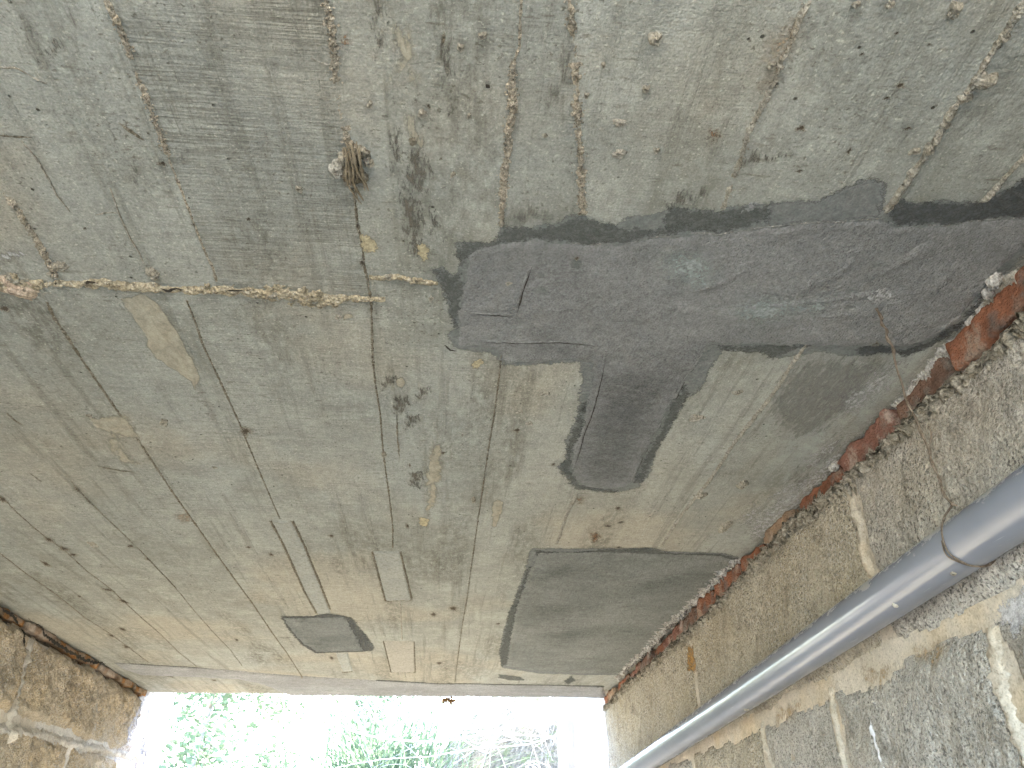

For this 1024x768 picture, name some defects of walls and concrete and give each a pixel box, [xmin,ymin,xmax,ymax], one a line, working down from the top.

crack [476,268,532,317]
crack [480,342,607,468]